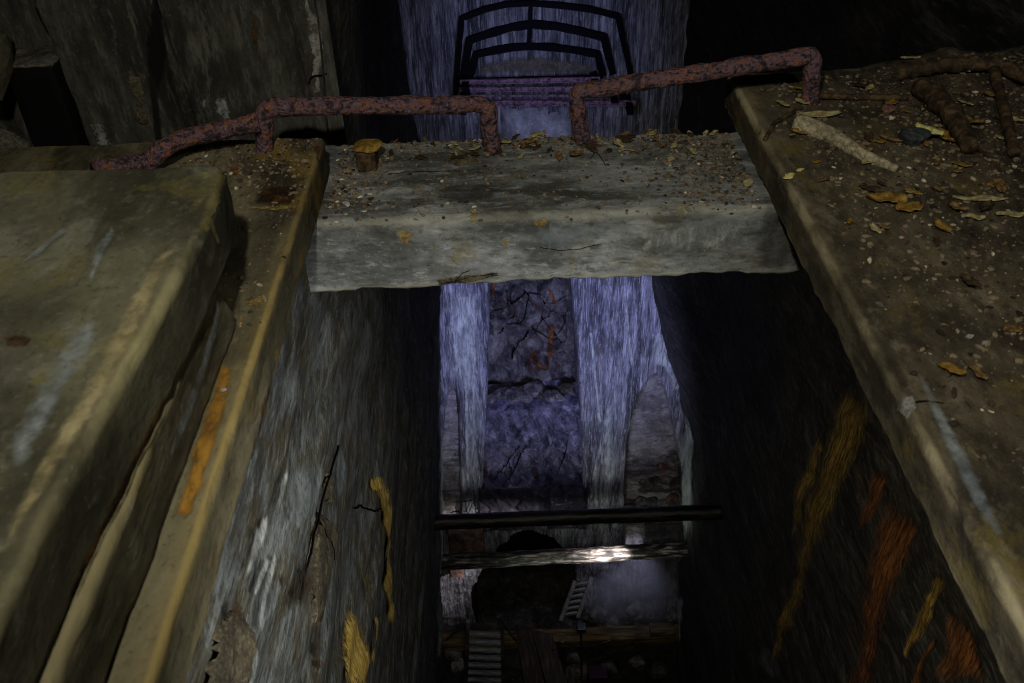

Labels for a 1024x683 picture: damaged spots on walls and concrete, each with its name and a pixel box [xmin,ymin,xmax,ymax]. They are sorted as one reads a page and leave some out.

rust [90,95,501,170]
rust [568,47,823,147]
crack [493,291,568,359]
crack [298,445,340,600]
crack [354,504,384,512]
water stain [343,477,395,683]
rust [850,475,917,683]
rust [903,578,943,683]
rust [938,620,979,679]